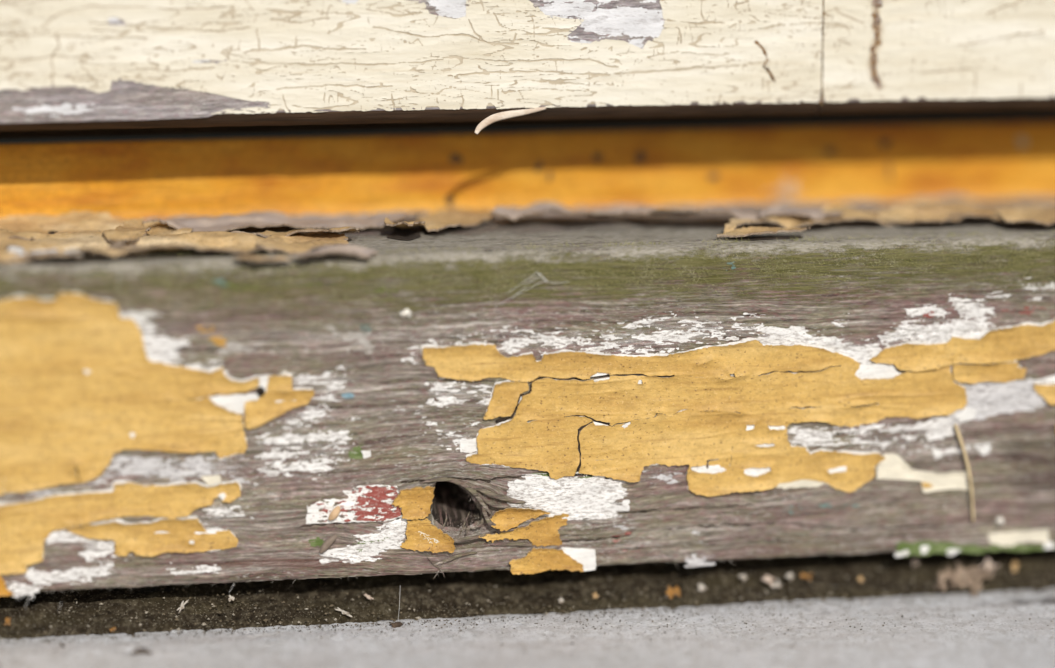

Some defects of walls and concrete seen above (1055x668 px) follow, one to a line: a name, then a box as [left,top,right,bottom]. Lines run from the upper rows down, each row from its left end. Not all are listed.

peeling [411,0,468,20]
peeling [529,0,665,49]
crack [755,41,775,83]
crack [818,0,826,105]
peeling [0,78,270,123]
peeling [0,194,1055,265]
peeling [0,291,315,596]
peeling [421,319,1055,497]
peeling [306,482,596,575]
peeling [895,529,1055,572]